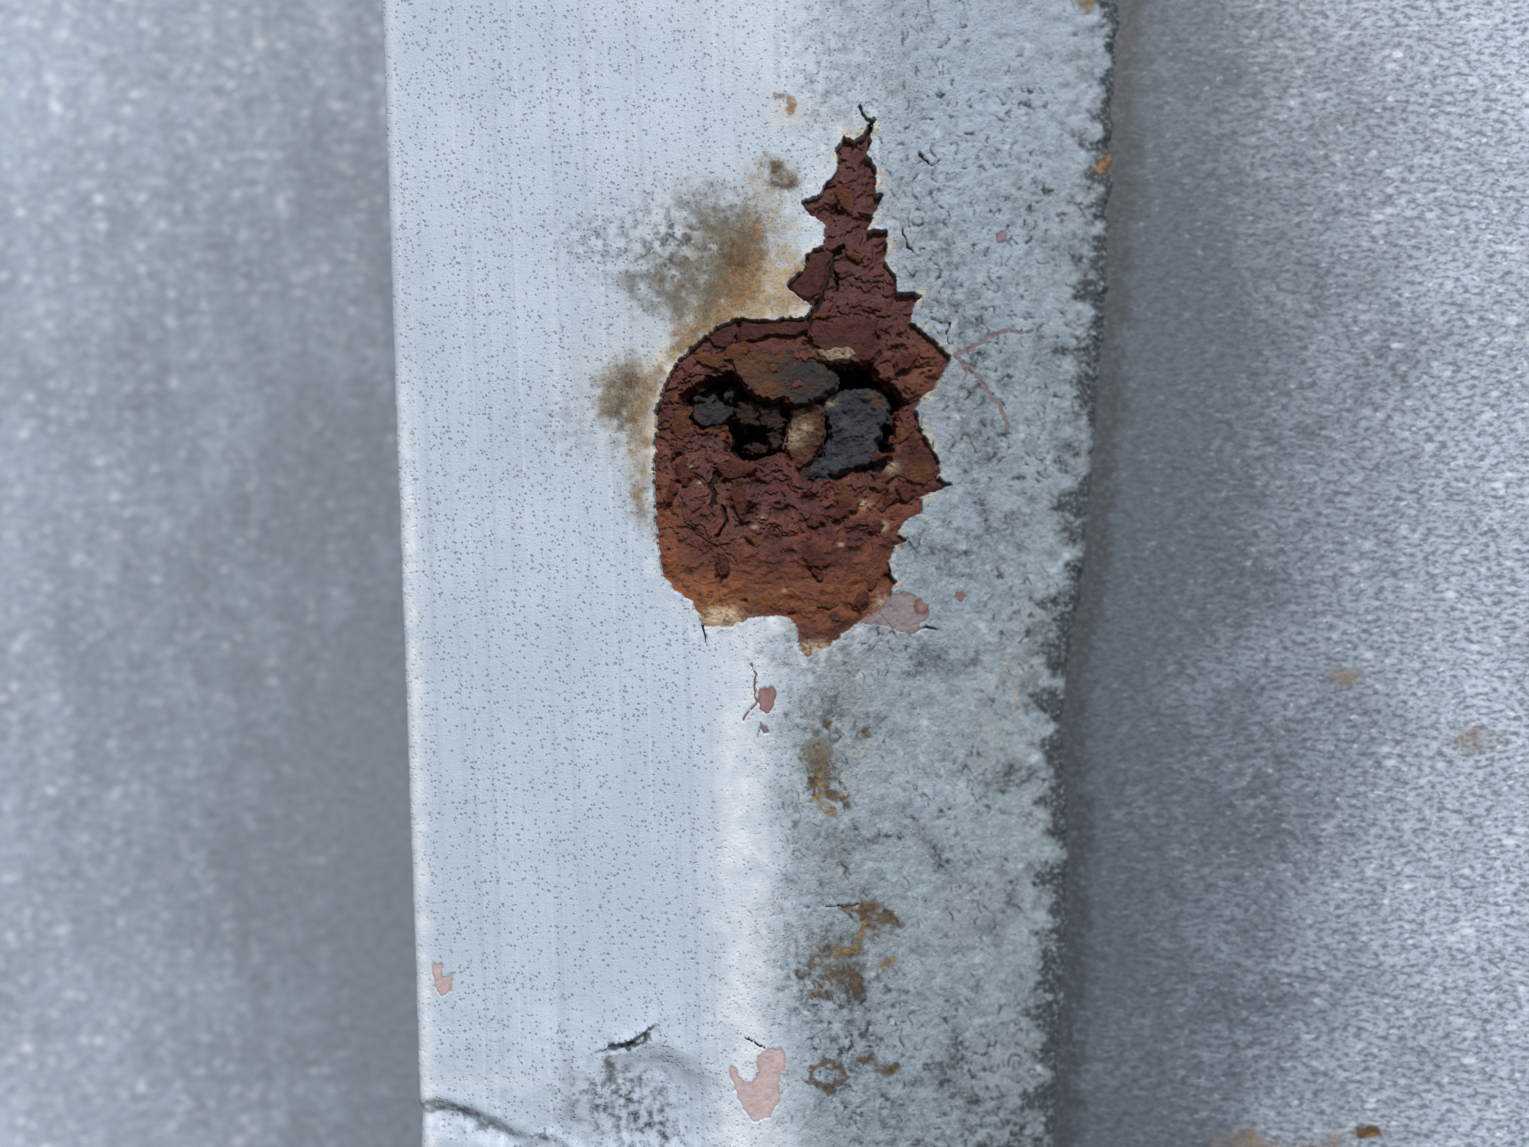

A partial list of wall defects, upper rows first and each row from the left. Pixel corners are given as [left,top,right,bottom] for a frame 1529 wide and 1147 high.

corrosion [604,123,950,656]
peeling [857,592,937,634]
corrosion [799,711,851,817]
peeling [432,963,454,996]
corrosion [796,901,899,1001]
peeling [729,1037,786,1122]
corrosion [806,1056,899,1095]